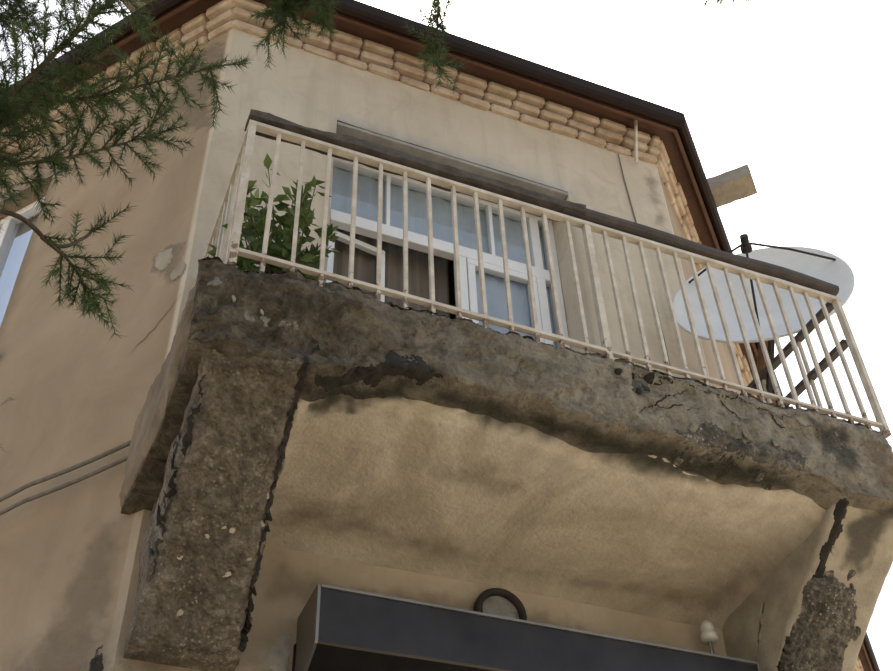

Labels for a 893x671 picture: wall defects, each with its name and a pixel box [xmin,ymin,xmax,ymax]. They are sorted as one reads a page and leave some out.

spalling [315,343,443,392]
spalling [614,368,655,396]
crack [631,370,819,437]
spalling [137,352,304,655]
spalling [776,498,861,671]
crack [89,645,104,671]